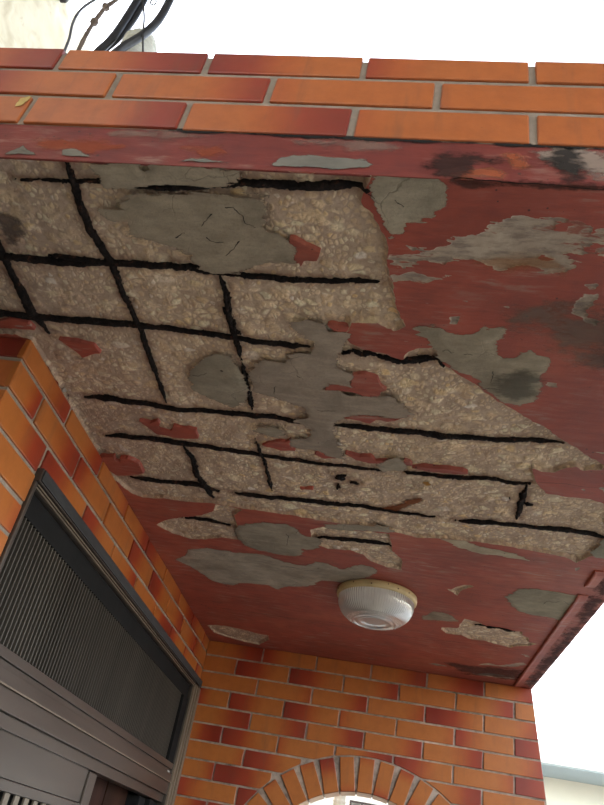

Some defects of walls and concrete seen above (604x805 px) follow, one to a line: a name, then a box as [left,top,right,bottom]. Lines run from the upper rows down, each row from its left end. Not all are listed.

leakage [169,128,475,143]
leakage [424,143,604,190]
crack [201,207,256,256]
spalling [0,130,604,571]
spalling [441,619,535,679]
leakage [446,582,604,687]